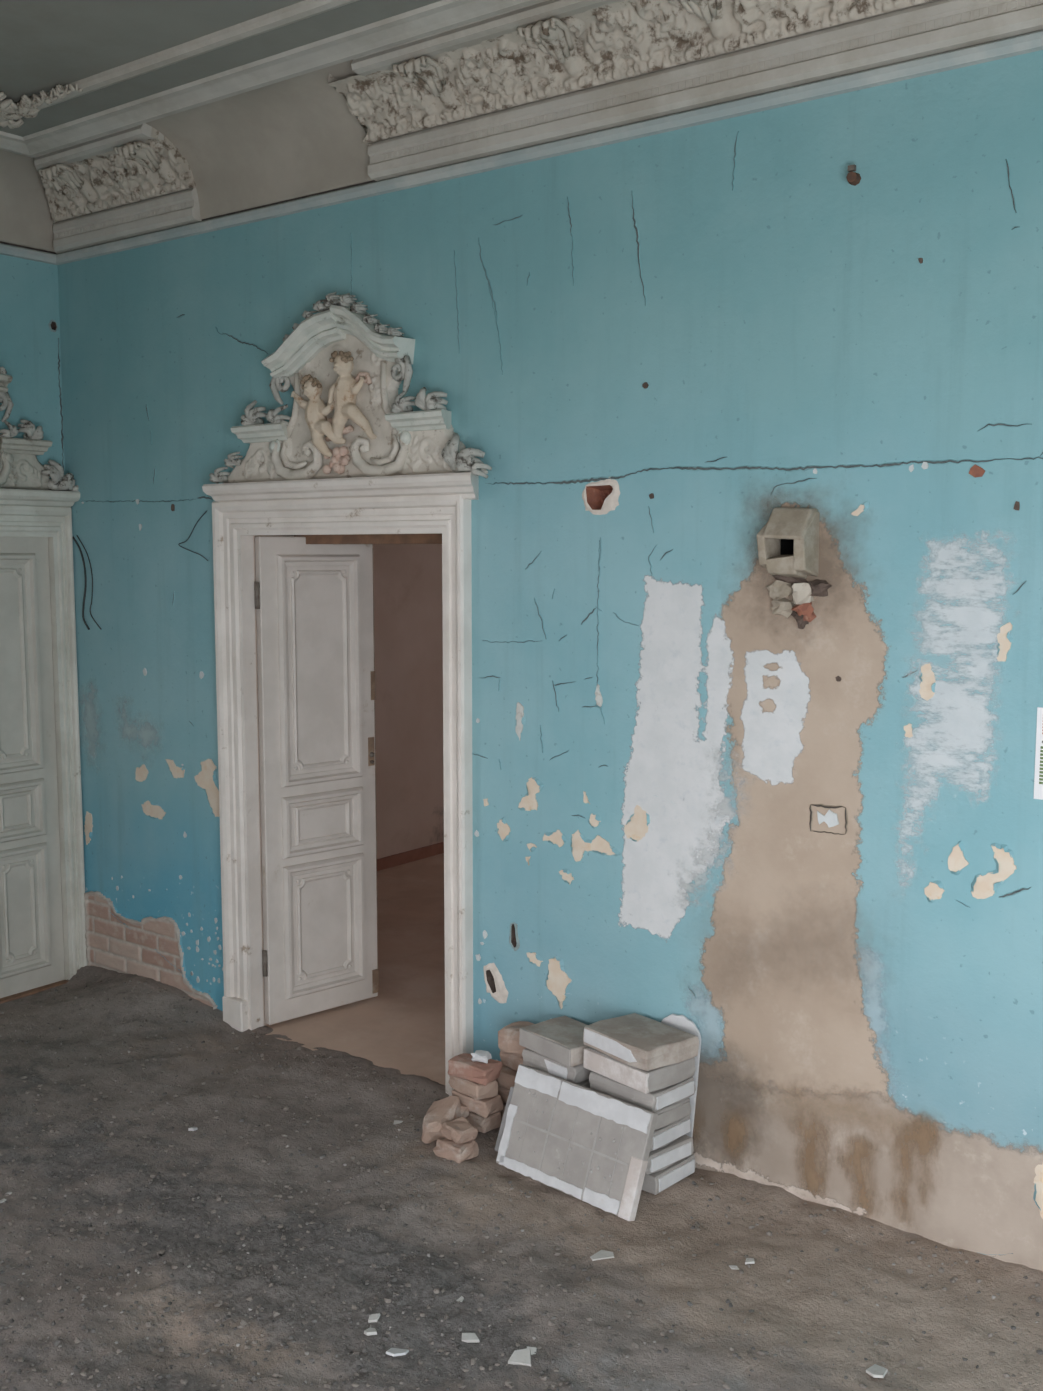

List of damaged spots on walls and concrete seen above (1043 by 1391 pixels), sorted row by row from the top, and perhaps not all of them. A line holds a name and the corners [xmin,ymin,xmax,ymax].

crack [1006,159,1019,230]
crack [632,193,646,306]
spalling [582,477,620,515]
crack [648,506,673,573]
crack [485,423,1043,495]
crack [483,537,639,760]
peeling [525,791,650,885]
flaking render [690,522,893,1102]
peeling [924,841,1017,903]
flaking render [84,876,223,1010]
flaking render [693,1152,866,1216]
damp [692,1058,1043,1271]